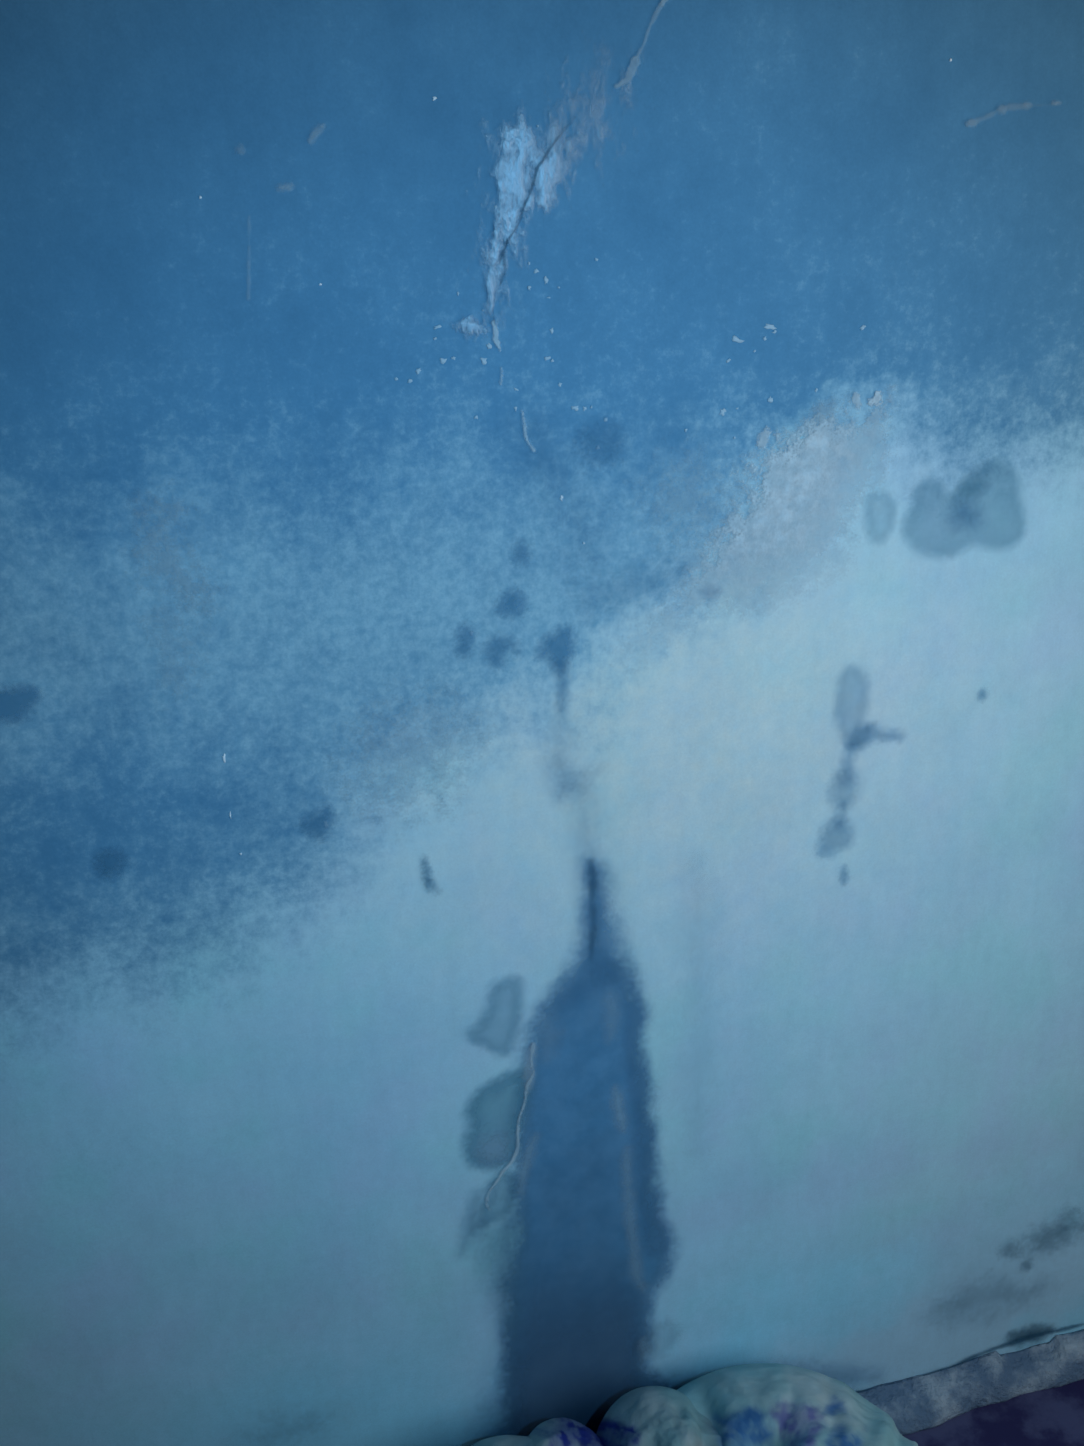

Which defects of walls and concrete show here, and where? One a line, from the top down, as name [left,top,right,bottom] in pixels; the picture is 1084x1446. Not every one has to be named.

crack [501,149,550,257]
crack [492,321,501,351]
damp [468,876,670,1436]